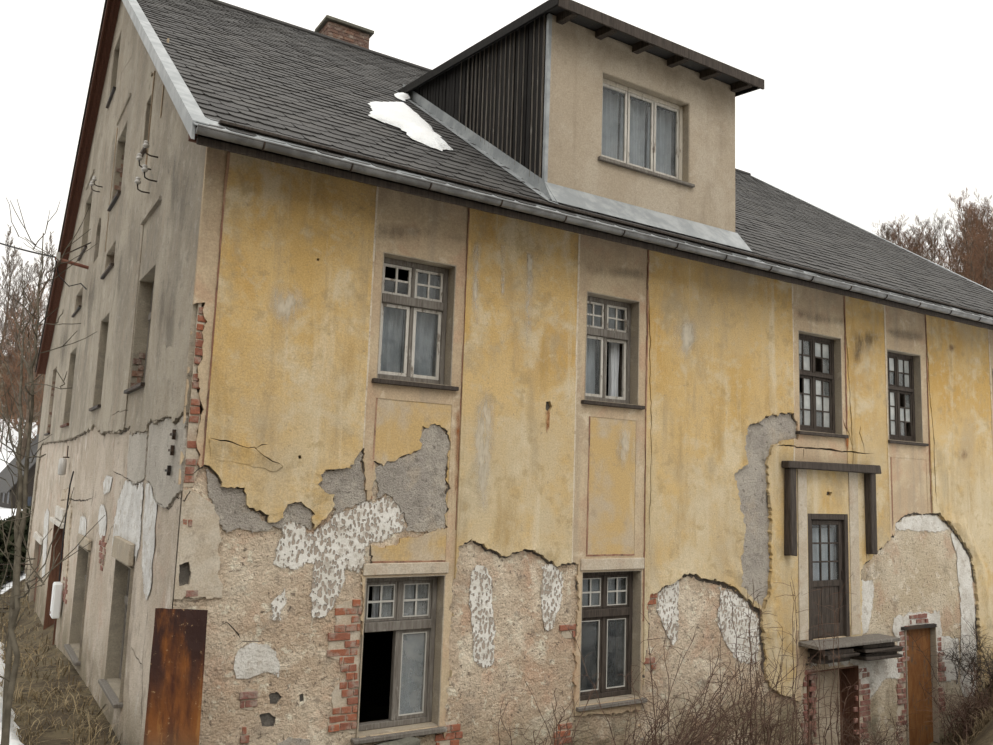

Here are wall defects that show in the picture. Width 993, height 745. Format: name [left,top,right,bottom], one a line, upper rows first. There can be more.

rust [143,608,208,745]
flaking render [24,303,450,745]
flaking render [415,413,978,745]